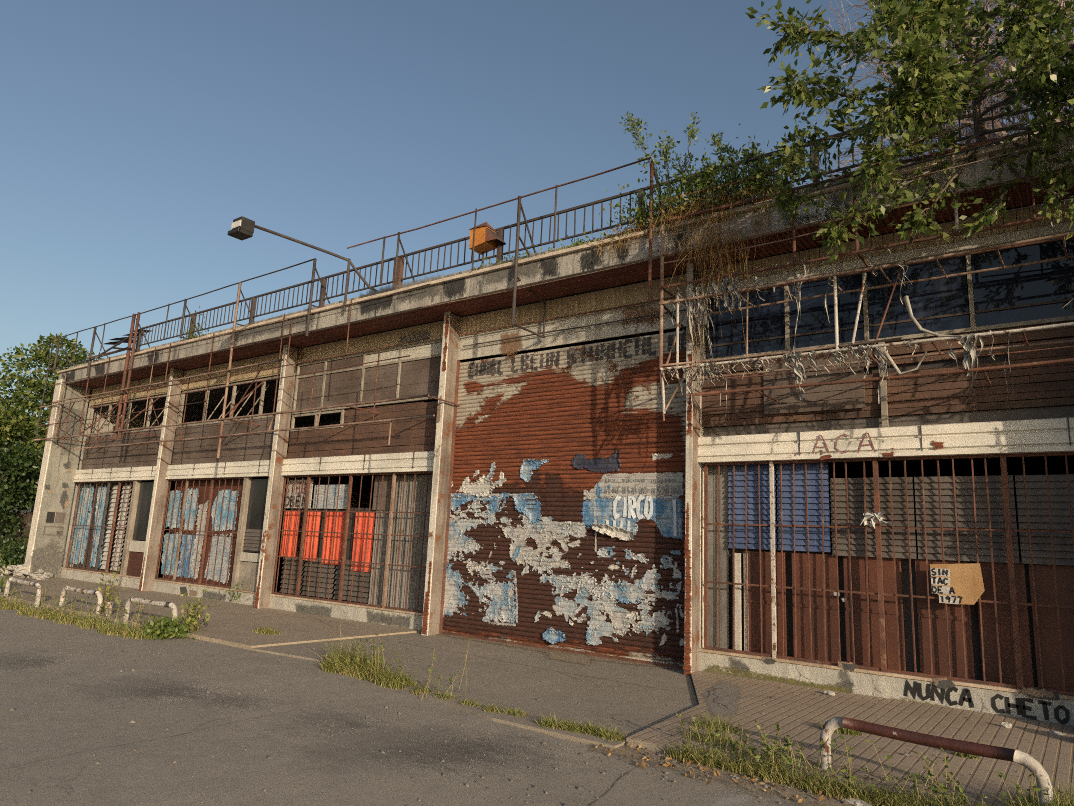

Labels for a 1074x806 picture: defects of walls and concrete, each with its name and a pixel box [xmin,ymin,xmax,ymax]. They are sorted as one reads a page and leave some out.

rust [442,350,692,676]